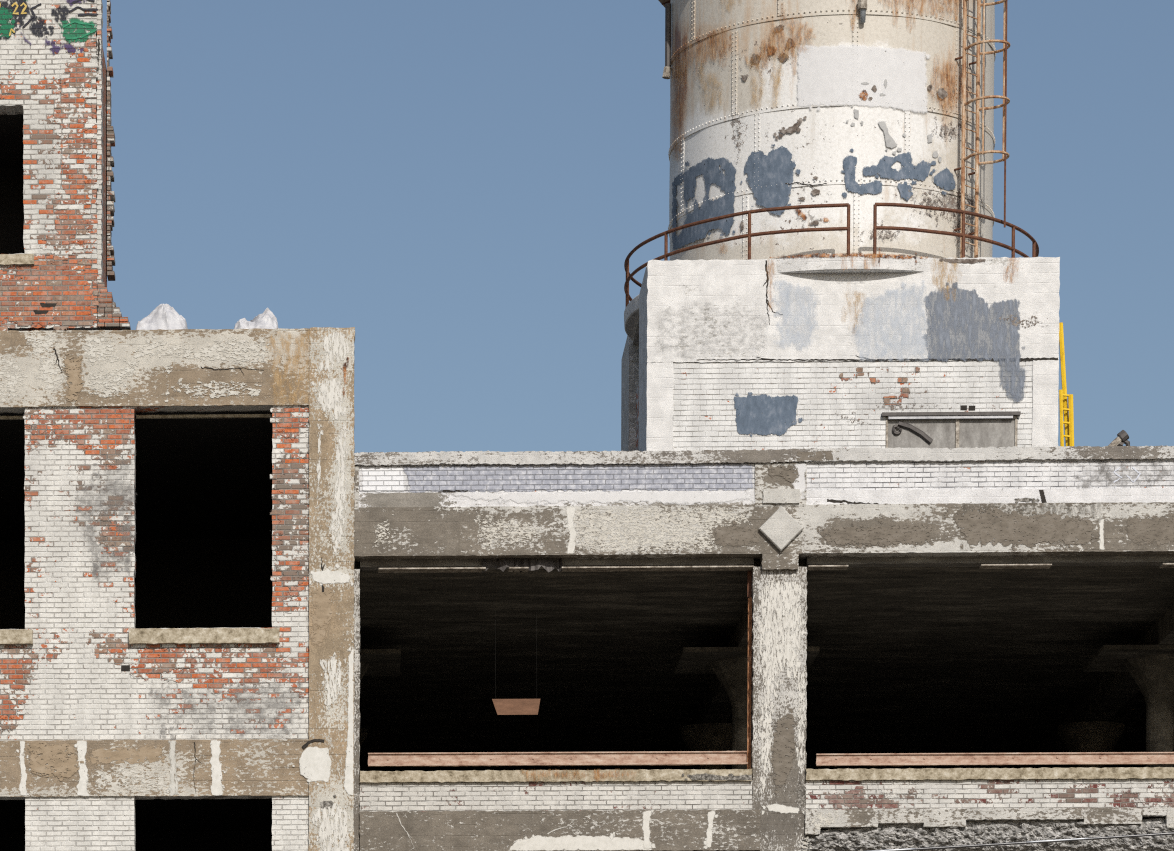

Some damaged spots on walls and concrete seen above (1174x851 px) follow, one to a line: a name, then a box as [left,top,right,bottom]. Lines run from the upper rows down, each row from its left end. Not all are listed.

rust [741,23,812,101]
rust [927,64,958,108]
flaking render [0,38,354,613]
crack [763,260,783,325]
crack [697,354,1058,362]
flaking render [877,367,937,410]
flaking render [86,630,291,696]
peeling [0,632,181,797]
peeling [210,740,226,796]
spalling [293,739,331,785]
peeling [312,640,354,851]
spalling [682,573,1174,851]